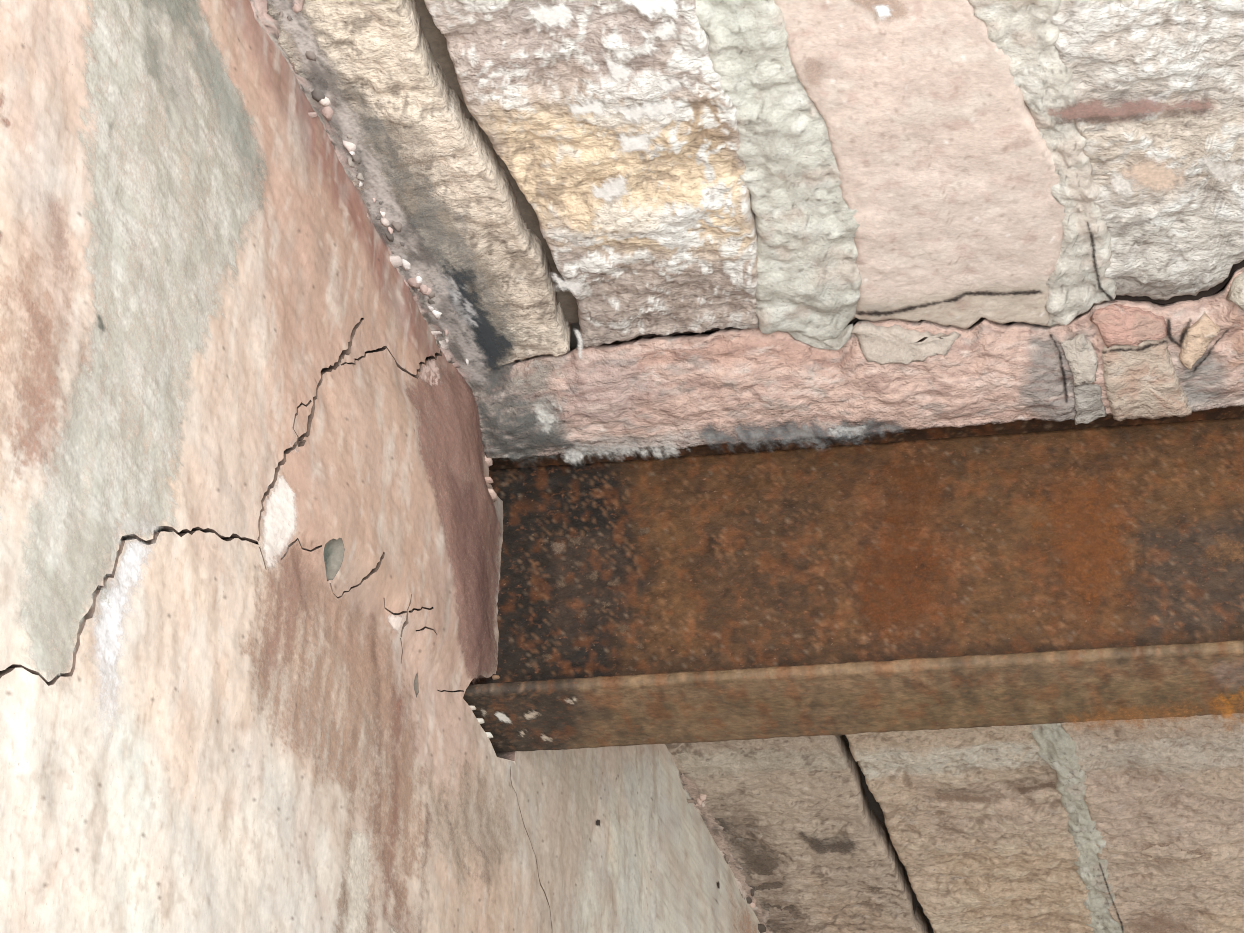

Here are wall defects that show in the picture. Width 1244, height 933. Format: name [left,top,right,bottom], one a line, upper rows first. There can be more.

crack [642,327,733,337]
crack [848,290,1042,329]
crack [1050,335,1068,402]
crack [1087,222,1244,372]
crack [0,319,442,686]
peeling [262,476,297,568]
rust [1069,691,1244,730]
crack [844,735,934,933]